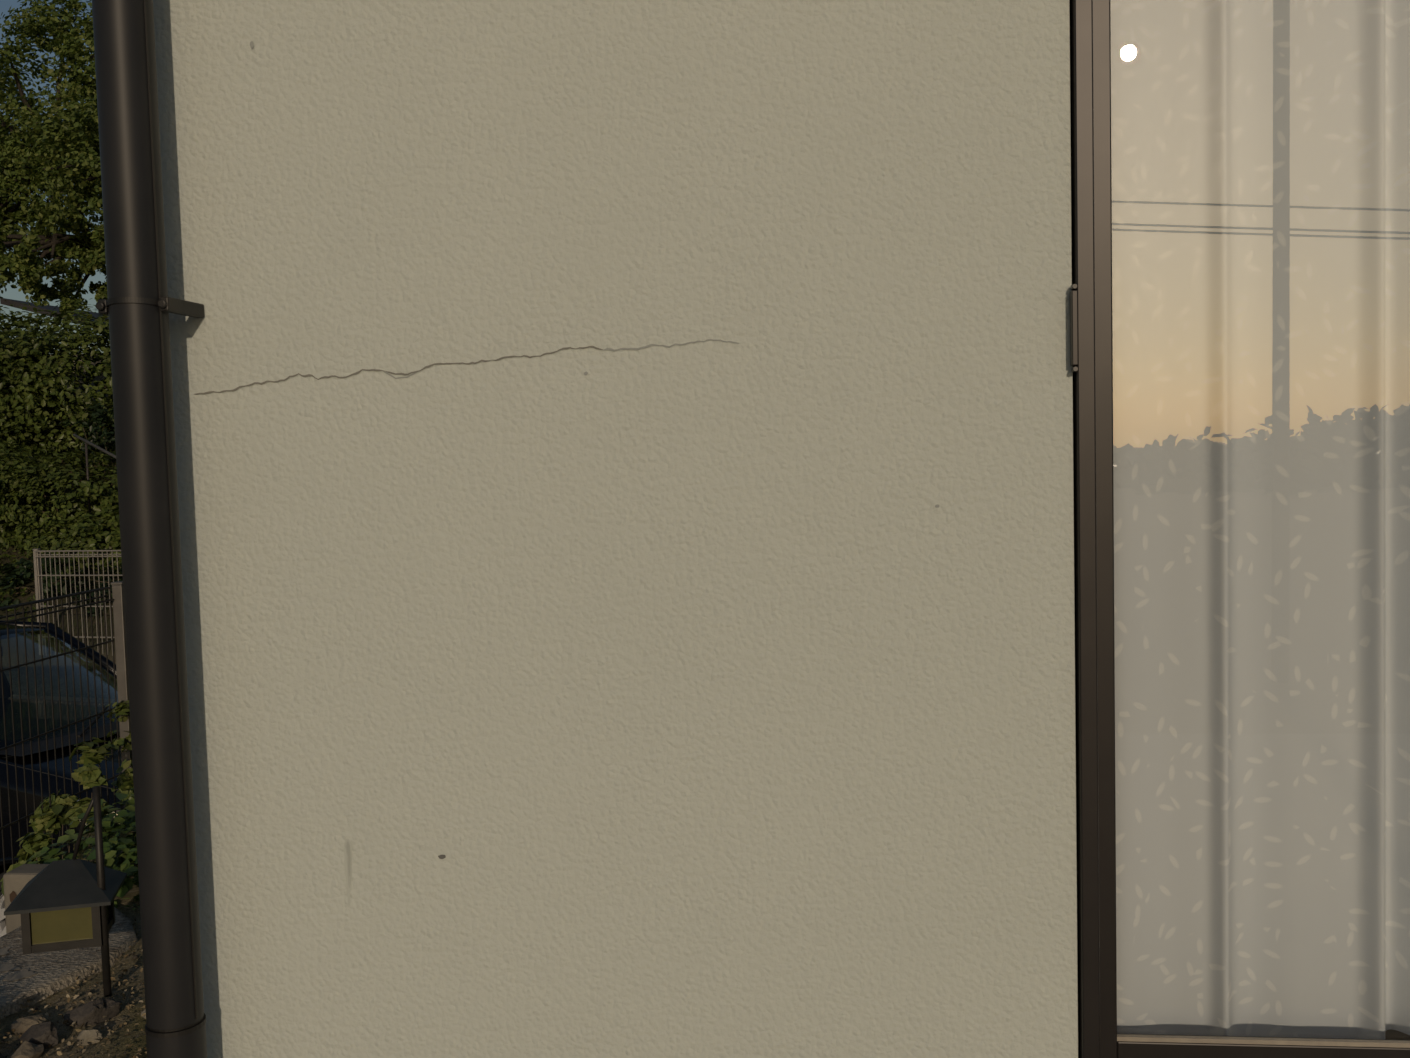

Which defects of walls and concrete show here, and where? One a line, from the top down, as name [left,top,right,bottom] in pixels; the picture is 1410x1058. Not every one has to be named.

crack [195,339,737,395]